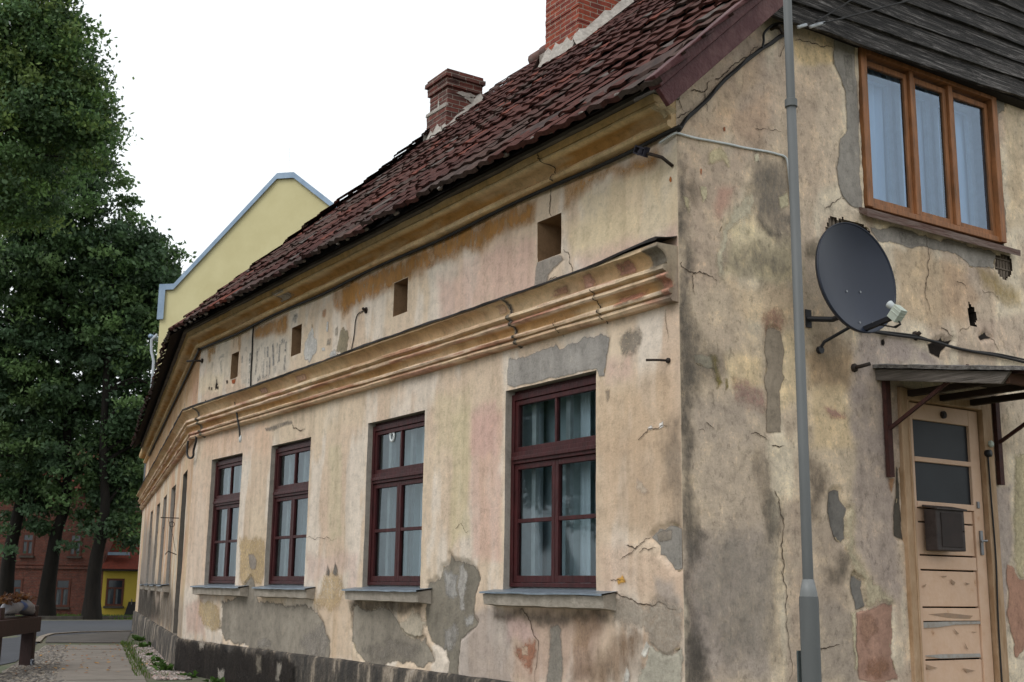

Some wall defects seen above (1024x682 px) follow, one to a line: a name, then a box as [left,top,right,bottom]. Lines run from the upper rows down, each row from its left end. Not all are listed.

flaking render [984,249,1011,280]
crack [501,298,523,349]
flaking render [352,556,481,674]
crack [611,537,676,610]
flaking render [653,524,685,572]
crack [775,492,793,680]
flaking render [828,490,898,682]